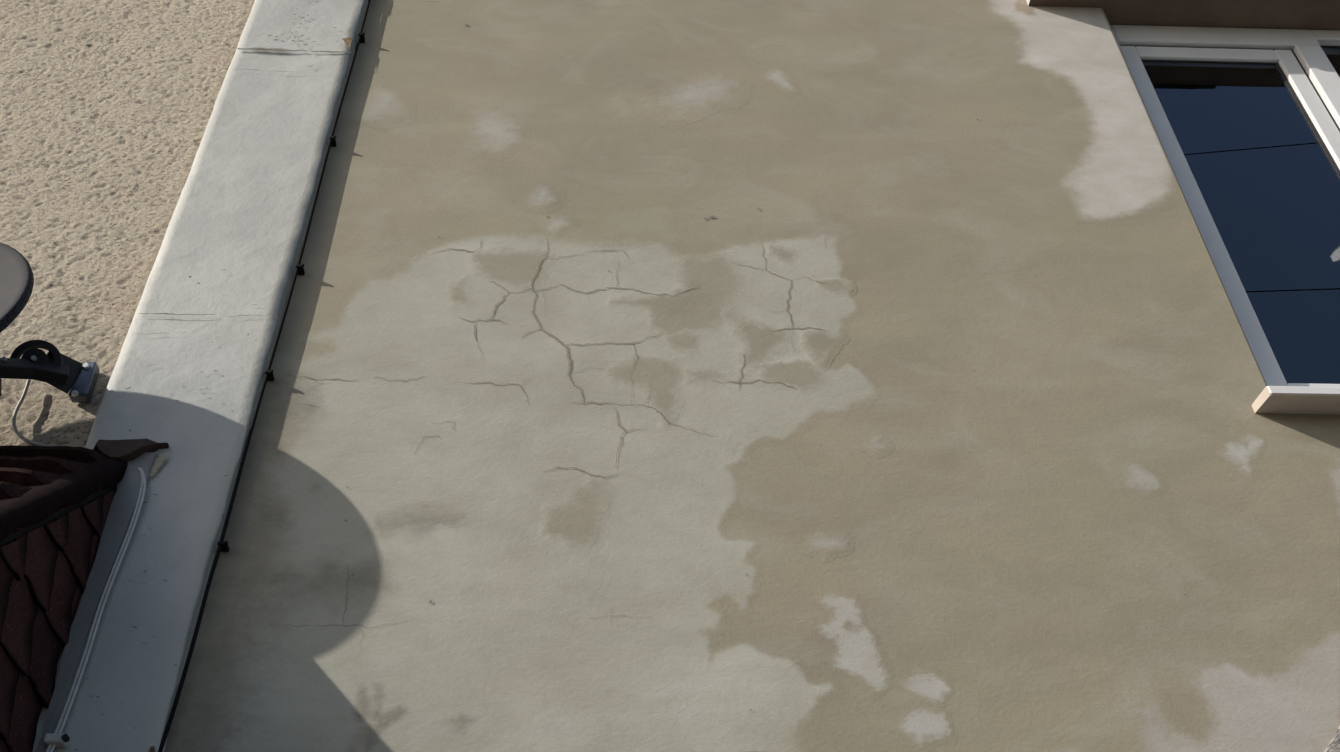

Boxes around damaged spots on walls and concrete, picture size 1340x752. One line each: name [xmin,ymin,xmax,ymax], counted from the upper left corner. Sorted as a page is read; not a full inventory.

damp [353,85,417,129]
damp [451,103,532,160]
damp [627,64,802,123]
damp [977,0,1183,226]
crack [734,248,829,347]
crack [461,239,706,482]
crack [715,355,795,389]
damp [165,181,882,752]
damp [1117,457,1169,498]
damp [1115,626,1340,752]